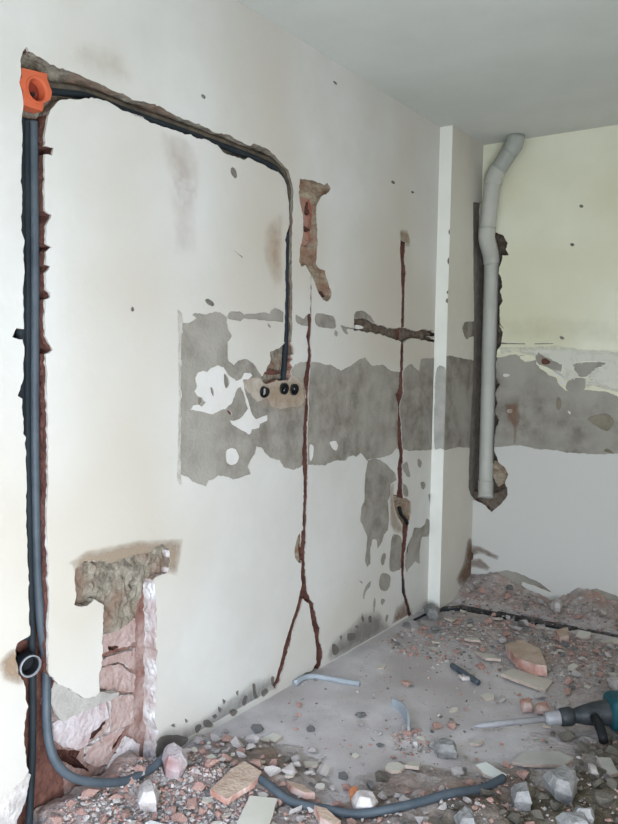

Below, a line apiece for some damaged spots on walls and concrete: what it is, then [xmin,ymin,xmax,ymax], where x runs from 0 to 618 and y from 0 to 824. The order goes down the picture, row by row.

flaking render [299,179,331,301]
flaking render [494,352,618,454]
flaking render [177,299,473,655]
spalling [40,544,275,795]
flaking render [0,773,31,824]